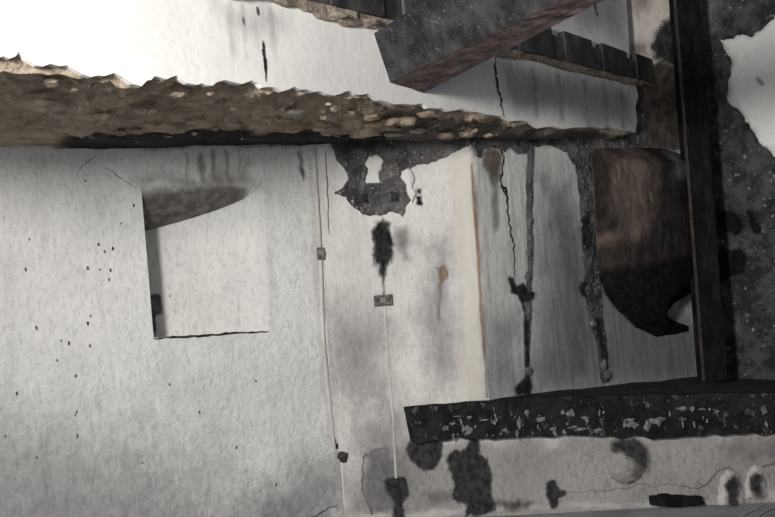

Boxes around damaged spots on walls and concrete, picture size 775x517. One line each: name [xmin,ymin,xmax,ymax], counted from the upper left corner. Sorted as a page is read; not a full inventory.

crack [494,56,504,115]
flaking render [720,17,775,157]
spalling [0,55,650,217]
leakage [483,149,501,226]
crack [492,146,515,277]
hole [717,210,761,234]
hole [718,248,745,281]
leakage [595,317,608,367]
leakage [360,440,566,517]